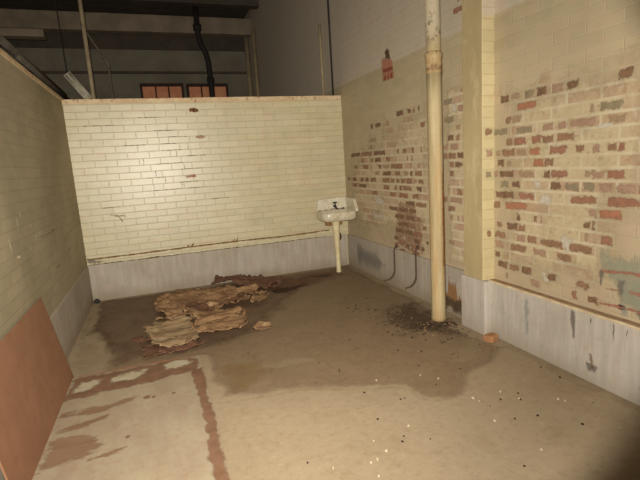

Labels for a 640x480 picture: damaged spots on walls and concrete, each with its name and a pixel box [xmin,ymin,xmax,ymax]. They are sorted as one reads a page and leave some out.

peeling [348,106,430,255]
peeling [443,89,464,265]
peeling [485,66,640,305]
water stain [94,267,497,396]
rust [445,283,462,313]
water stain [600,254,640,316]